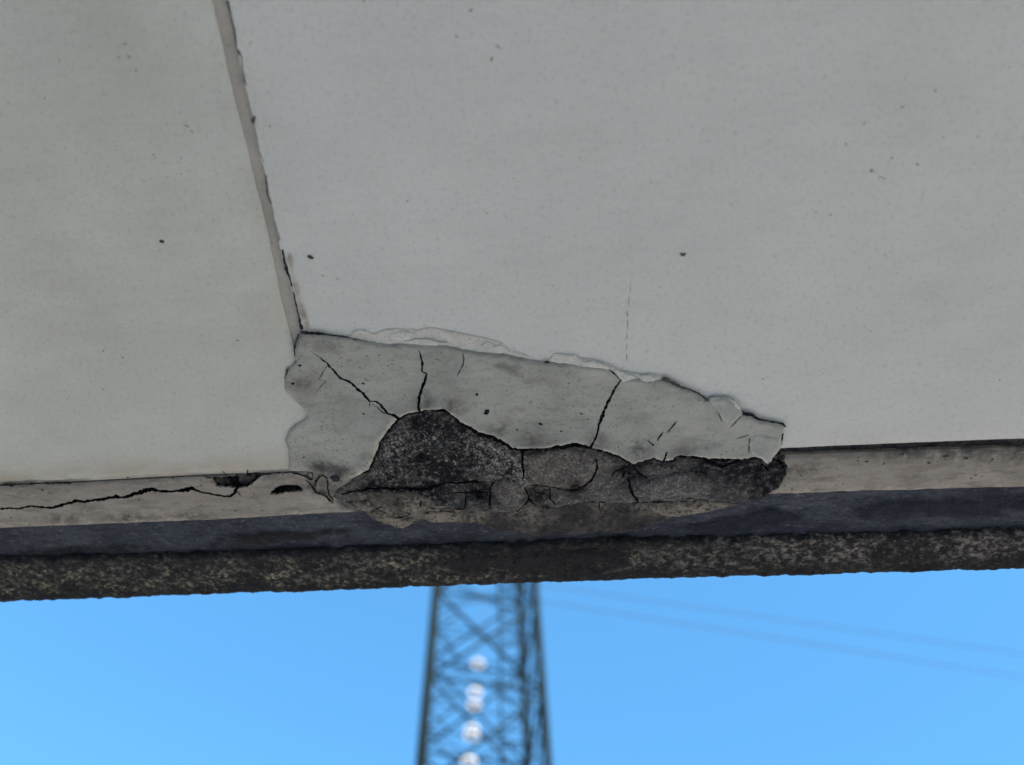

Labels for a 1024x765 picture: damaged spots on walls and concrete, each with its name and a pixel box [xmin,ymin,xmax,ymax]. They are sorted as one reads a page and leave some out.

crack [227,0,245,82]
crack [0,124,787,518]
peeling [284,327,788,537]